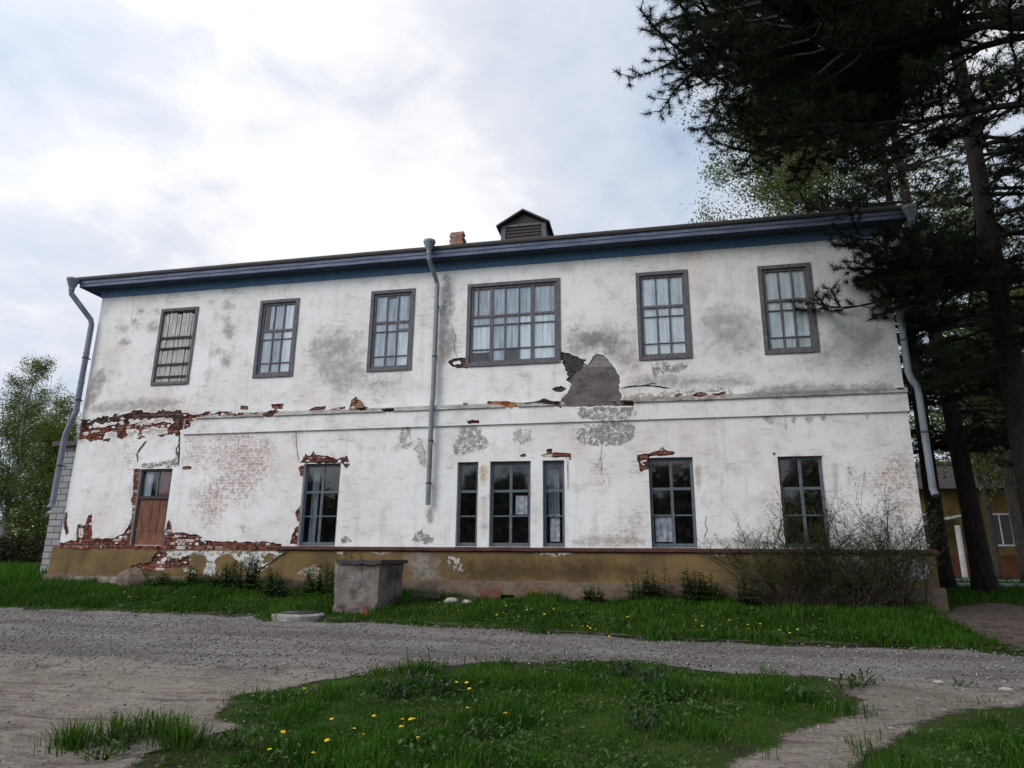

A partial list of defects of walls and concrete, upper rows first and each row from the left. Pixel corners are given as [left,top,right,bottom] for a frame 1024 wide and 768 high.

spalling [448,358,467,369]
flaking render [487,354,732,446]
spalling [79,404,284,443]
peeling [453,420,487,455]
spalling [299,451,350,477]
spalling [637,448,675,472]
spalling [61,450,192,546]
spalling [131,507,300,576]